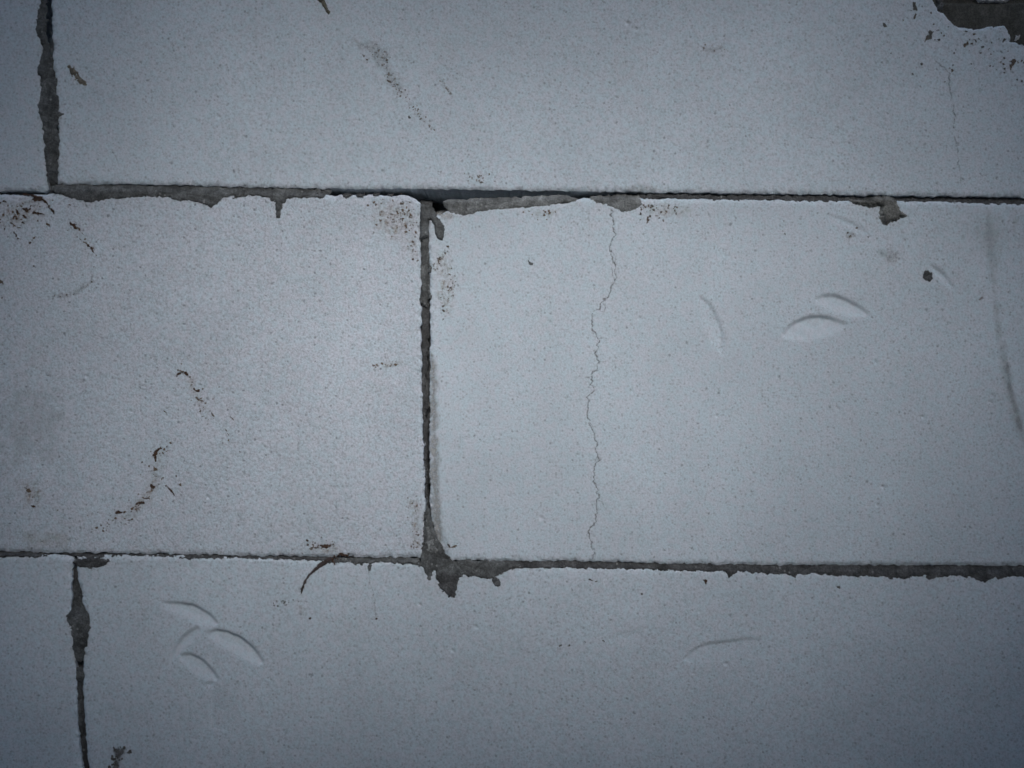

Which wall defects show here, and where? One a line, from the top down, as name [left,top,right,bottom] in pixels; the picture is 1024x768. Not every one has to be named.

spalling [903,0,1024,82]
corrosion [87,442,181,532]